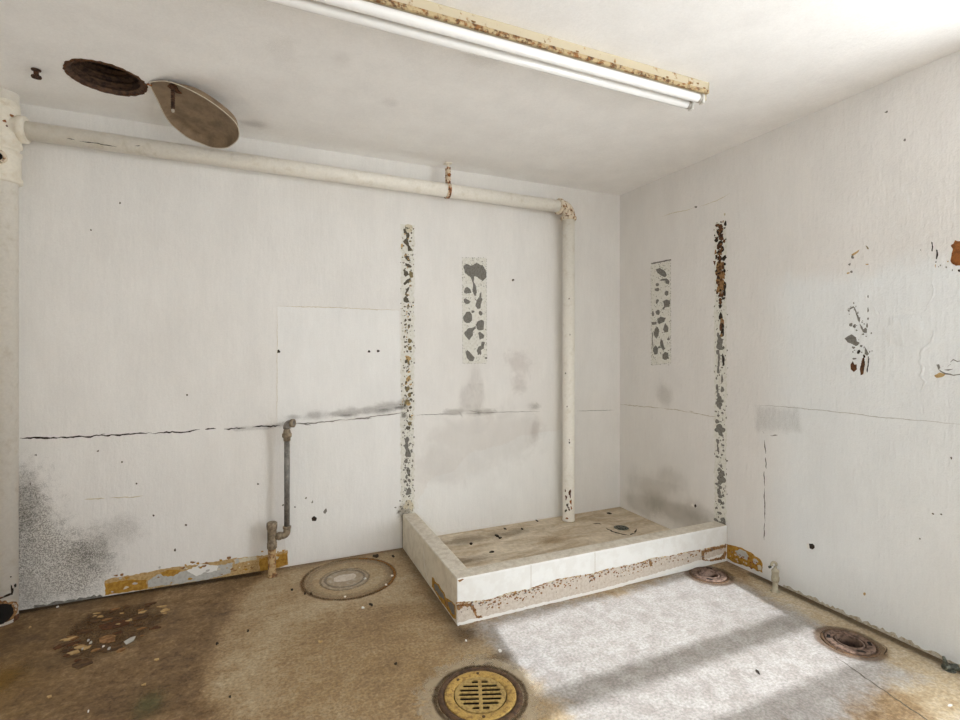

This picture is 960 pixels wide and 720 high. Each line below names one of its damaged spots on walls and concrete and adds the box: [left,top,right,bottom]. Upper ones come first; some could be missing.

peeling [394,224,415,517]
peeling [462,257,487,364]
peeling [651,259,671,365]
peeling [713,213,728,525]
peeling [845,296,872,375]
crack [22,410,496,439]
crack [763,432,777,536]
peeling [187,564,218,576]